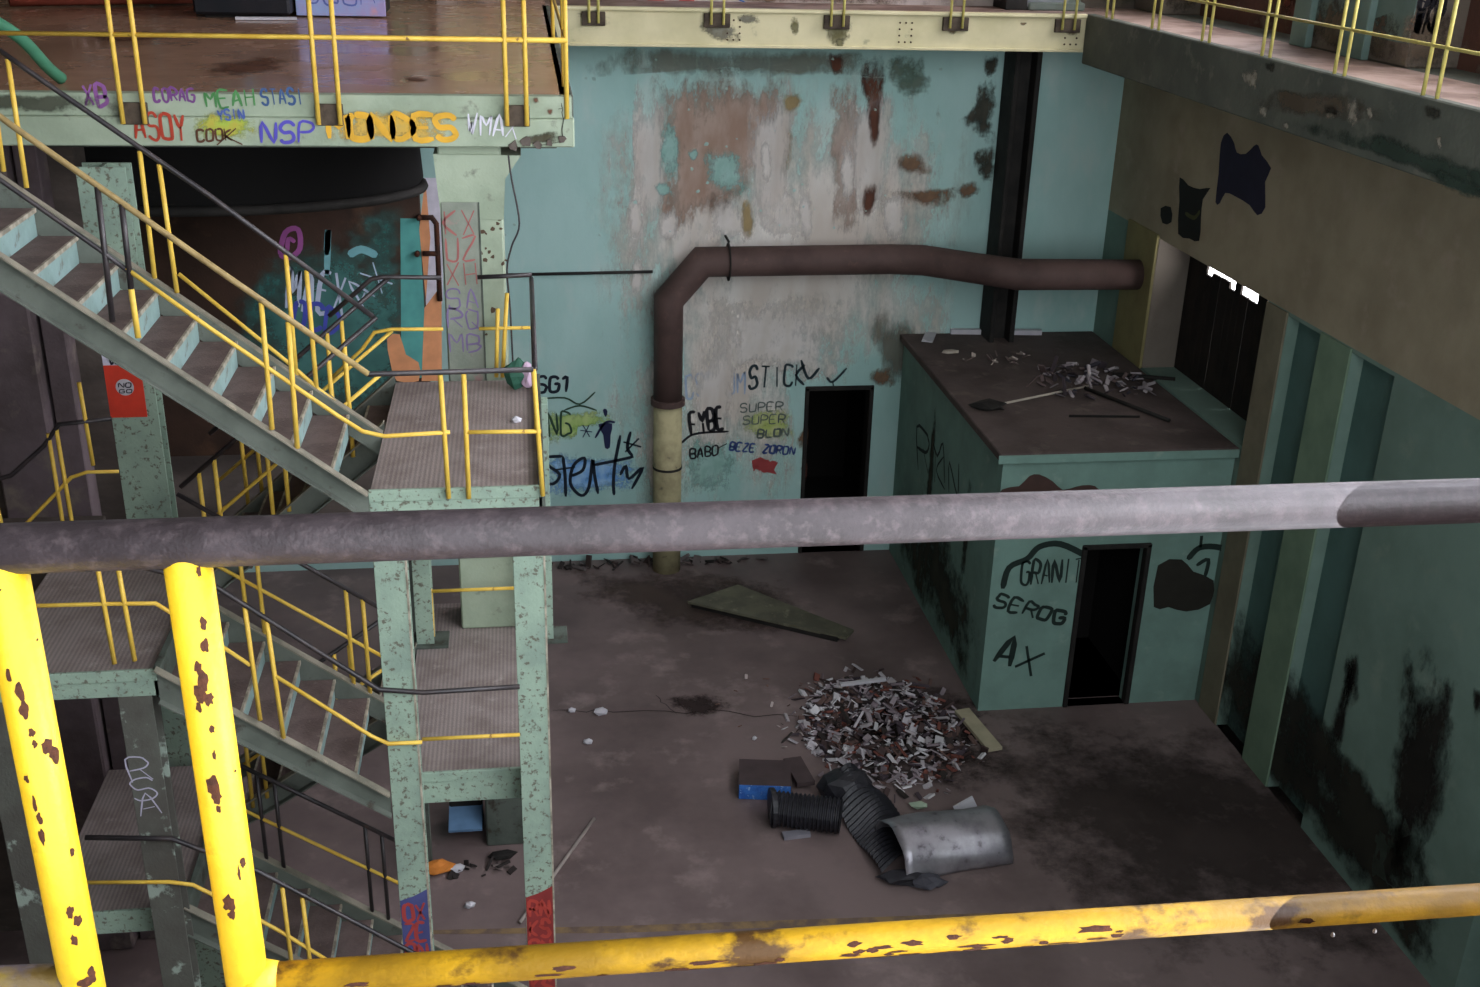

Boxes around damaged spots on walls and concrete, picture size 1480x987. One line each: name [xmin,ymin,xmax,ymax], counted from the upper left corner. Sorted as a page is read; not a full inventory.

peeling [628,56,779,293]
peeling [828,58,913,238]
corrosion [6,668,59,764]
corrosion [194,616,222,813]
leakage [1330,672,1352,750]
corrosion [24,775,45,846]
corrosion [66,906,82,946]
corrosion [77,966,97,987]
corrosion [222,894,236,920]
corrosion [940,925,1124,953]